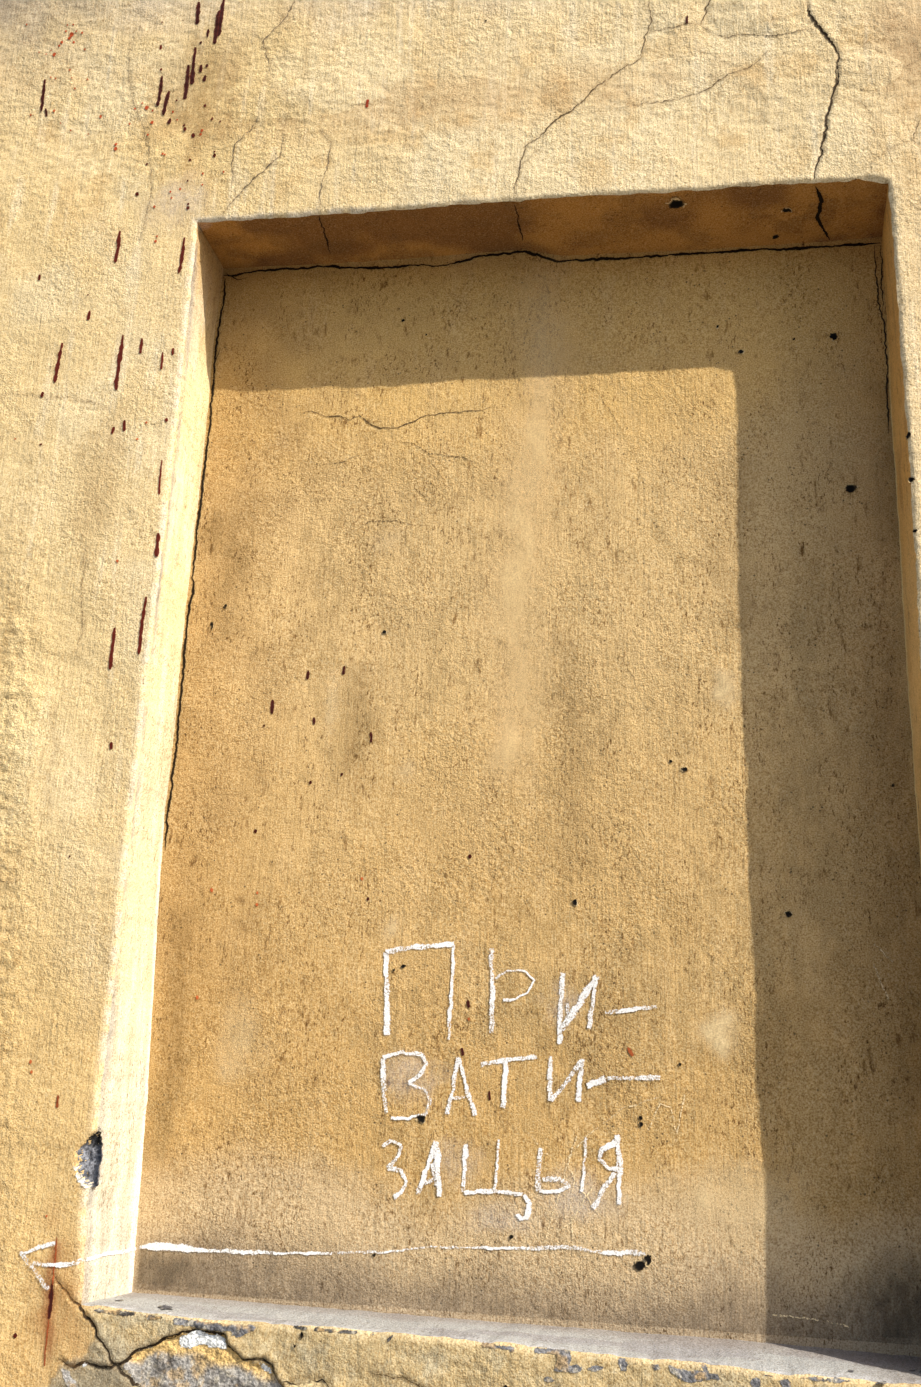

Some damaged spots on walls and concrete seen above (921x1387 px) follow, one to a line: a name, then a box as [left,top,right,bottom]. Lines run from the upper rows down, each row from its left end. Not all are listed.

corrosion [129,0,225,137]
corrosion [30,69,88,131]
corrosion [41,343,63,397]
corrosion [114,335,143,390]
crack [165,0,920,847]
flaking render [73,1127,103,1189]
peeling [61,1363,88,1387]
crack [55,1277,329,1387]
flaking render [94,1300,322,1387]
peeling [652,1363,720,1383]
peeling [751,1370,854,1387]